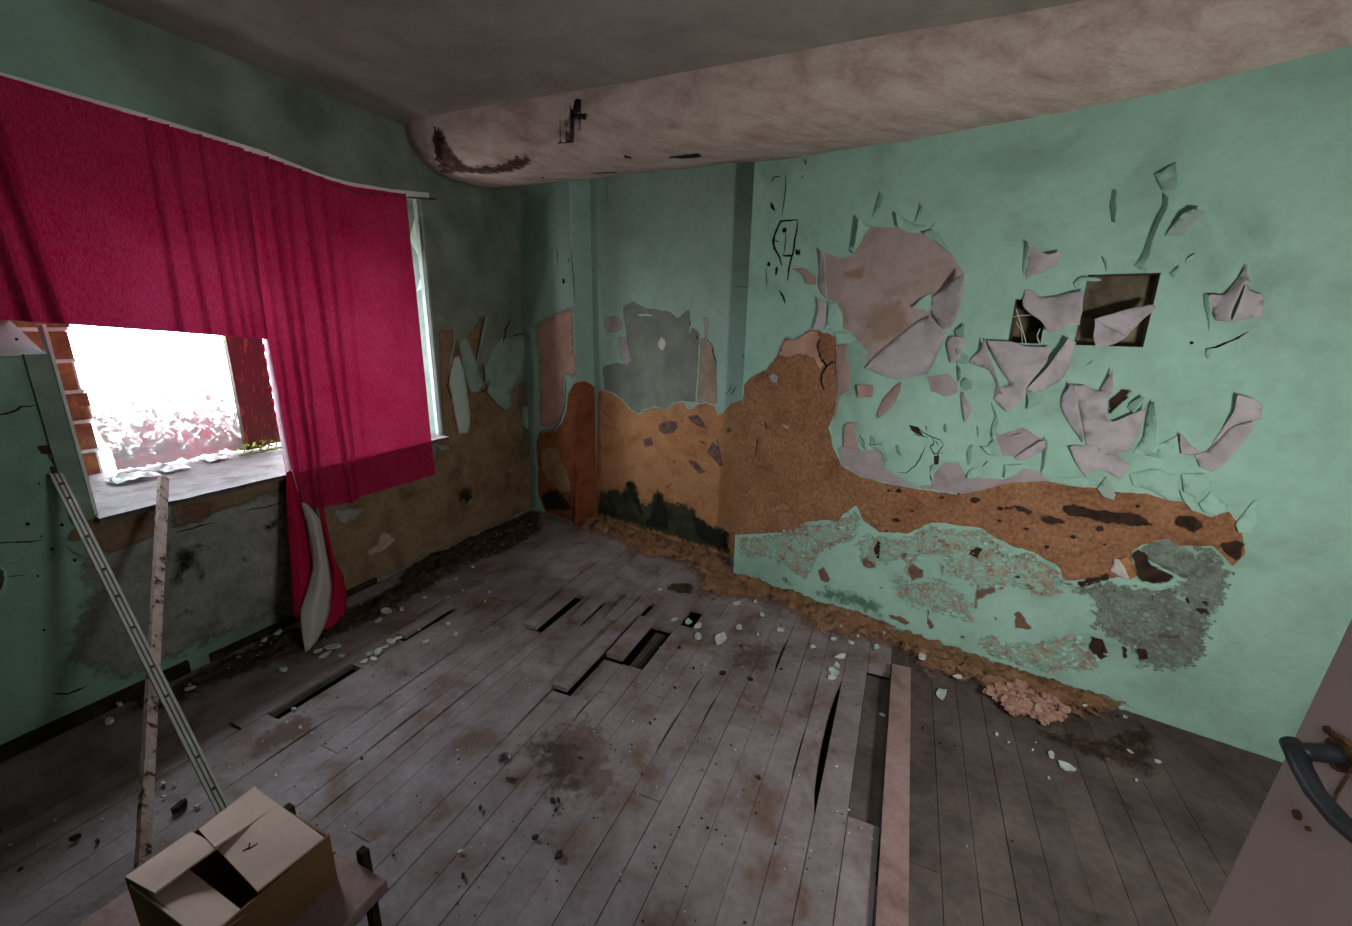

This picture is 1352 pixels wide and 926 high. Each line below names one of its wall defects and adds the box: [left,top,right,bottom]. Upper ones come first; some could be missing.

hole [1075,273,1160,347]
spalling [324,300,1245,674]
mould [170,544,205,583]